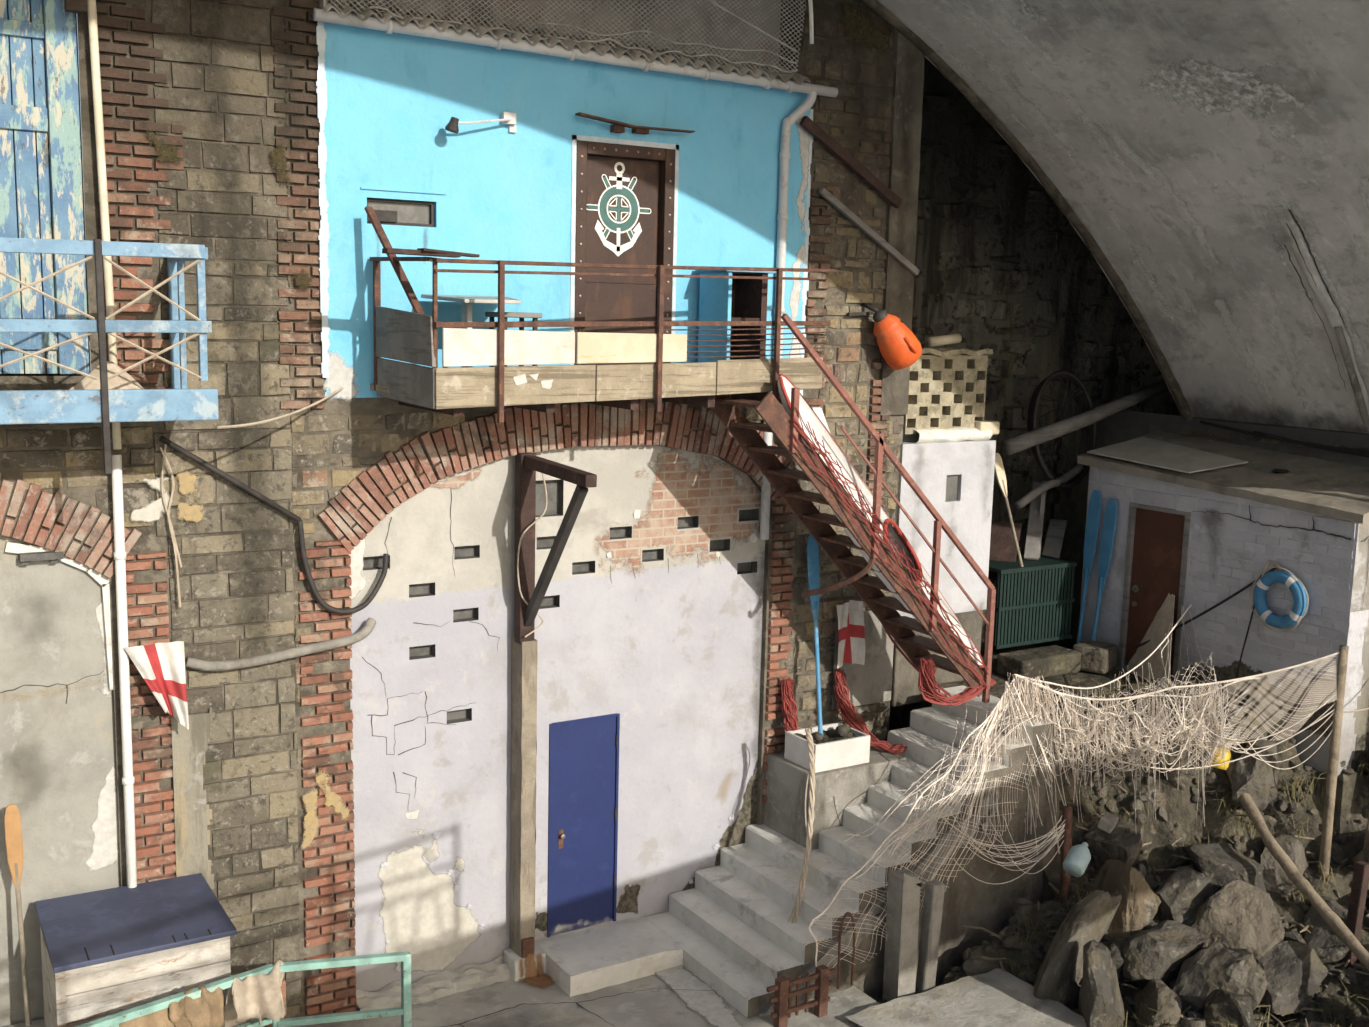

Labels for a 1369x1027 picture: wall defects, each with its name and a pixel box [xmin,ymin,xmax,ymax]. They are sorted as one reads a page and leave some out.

peeling [1140,58,1306,138]
flaking render [316,21,357,399]
flaking render [595,448,761,572]
peeling [95,602,111,697]
crack [362,657,472,812]
peeling [86,766,119,870]
peeling [378,809,485,973]